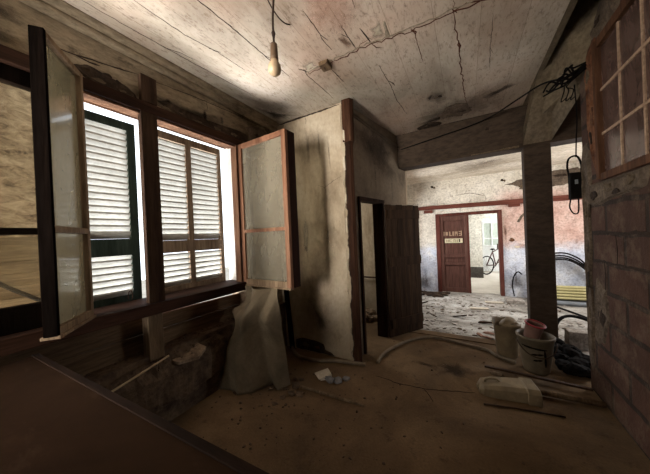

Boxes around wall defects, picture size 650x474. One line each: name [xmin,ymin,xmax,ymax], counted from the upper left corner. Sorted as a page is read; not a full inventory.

spalling [74,64,136,98]
crack [157,0,486,131]